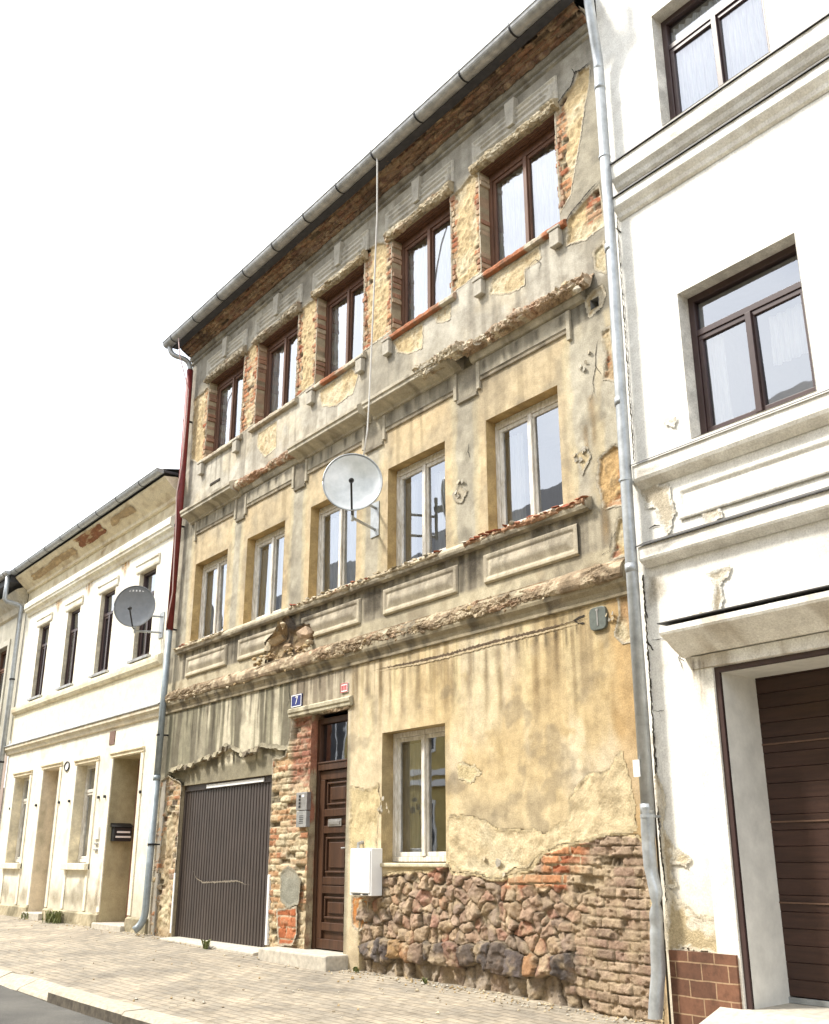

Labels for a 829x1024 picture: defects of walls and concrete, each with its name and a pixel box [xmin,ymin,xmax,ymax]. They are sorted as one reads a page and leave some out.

flaking render [180,1,607,491]
spalling [165,444,625,703]
peeling [641,482,677,535]
peeling [693,564,731,615]
flaking render [148,706,350,949]
flaking render [349,750,664,1024]